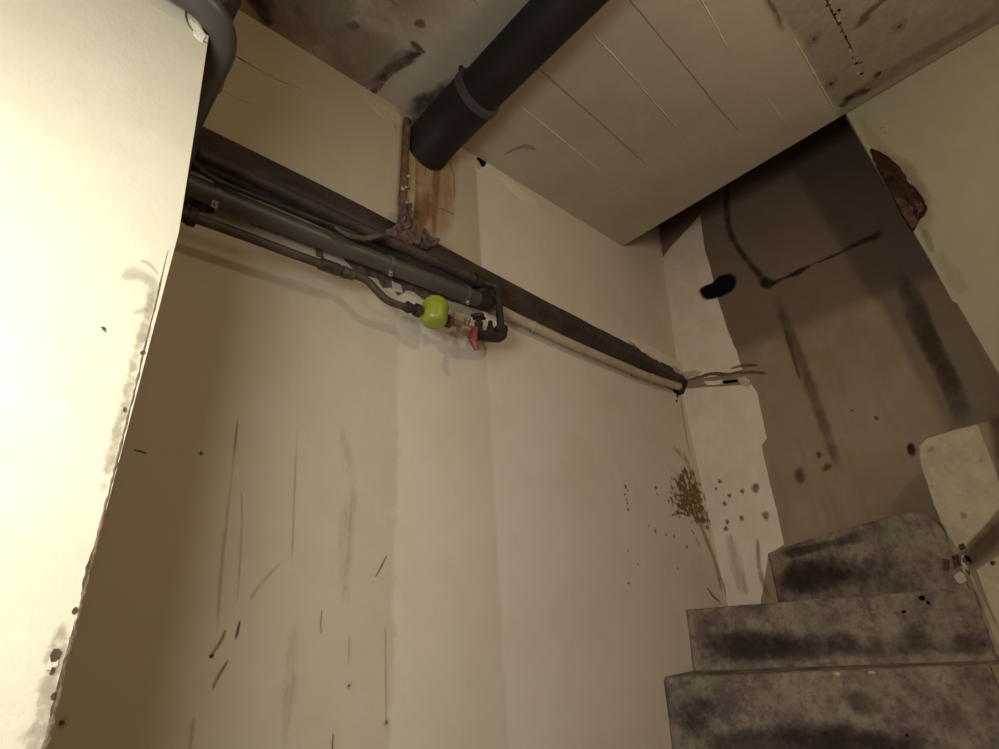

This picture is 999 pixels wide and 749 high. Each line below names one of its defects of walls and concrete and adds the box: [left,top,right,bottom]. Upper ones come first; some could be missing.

leakage [371,42,425,93]
crack [826,0,864,75]
corrosion [385,159,452,250]
spalling [870,148,928,231]
flaking render [631,339,765,388]